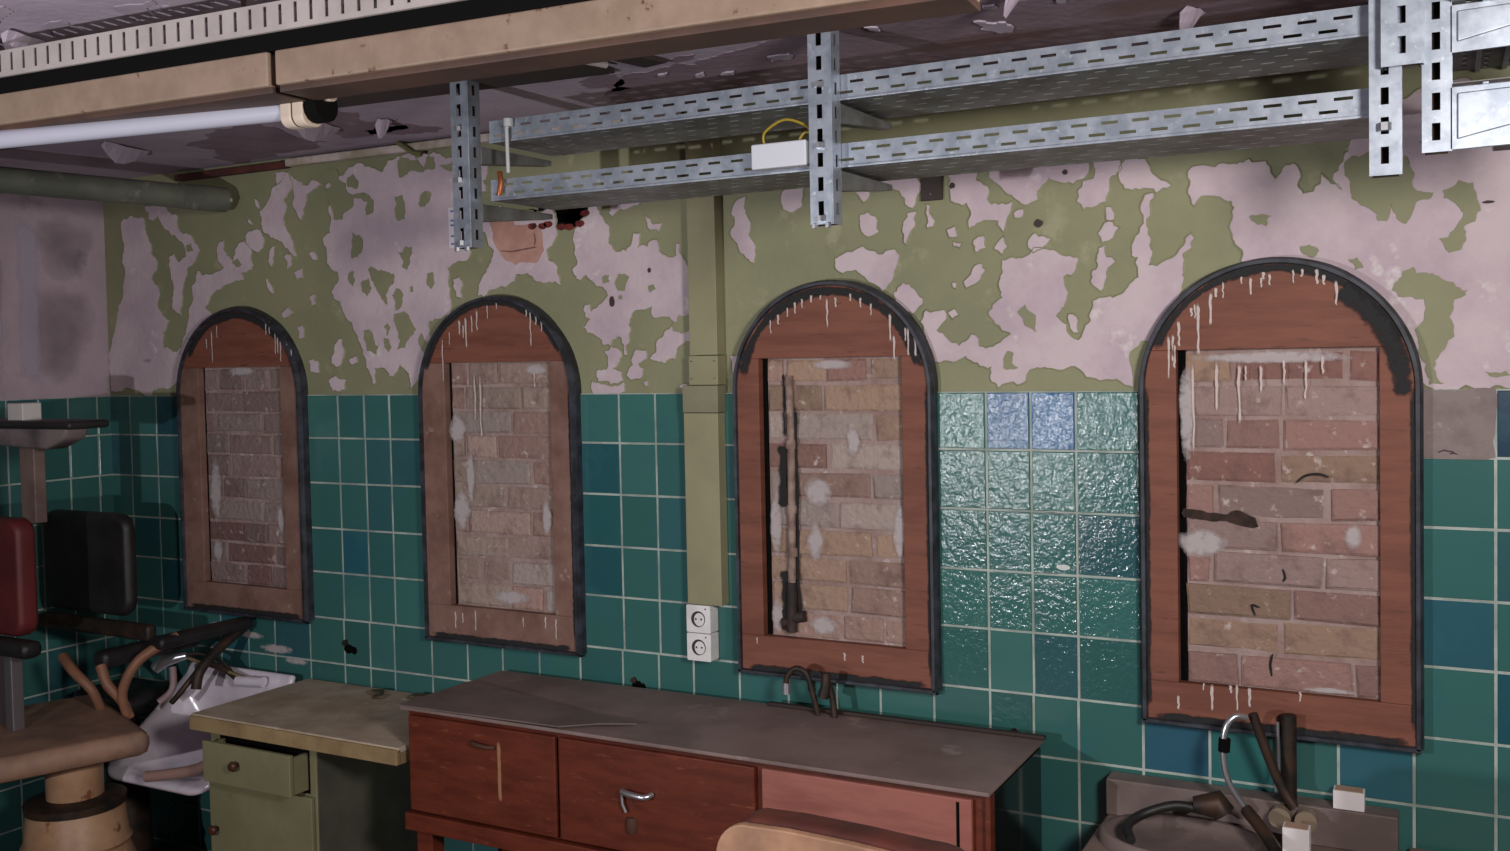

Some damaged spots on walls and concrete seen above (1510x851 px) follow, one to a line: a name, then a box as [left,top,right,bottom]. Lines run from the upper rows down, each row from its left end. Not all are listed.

peeling [579,35,808,110]
peeling [834,0,1369,85]
peeling [101,111,689,396]
peeling [729,195,758,264]
peeling [779,188,805,214]
peeling [833,87,1510,460]
water stain [188,312,292,362]
water stain [425,300,559,380]
water stain [739,287,922,373]
water stain [436,393,575,651]
water stain [752,392,932,688]
water stain [1145,263,1416,745]